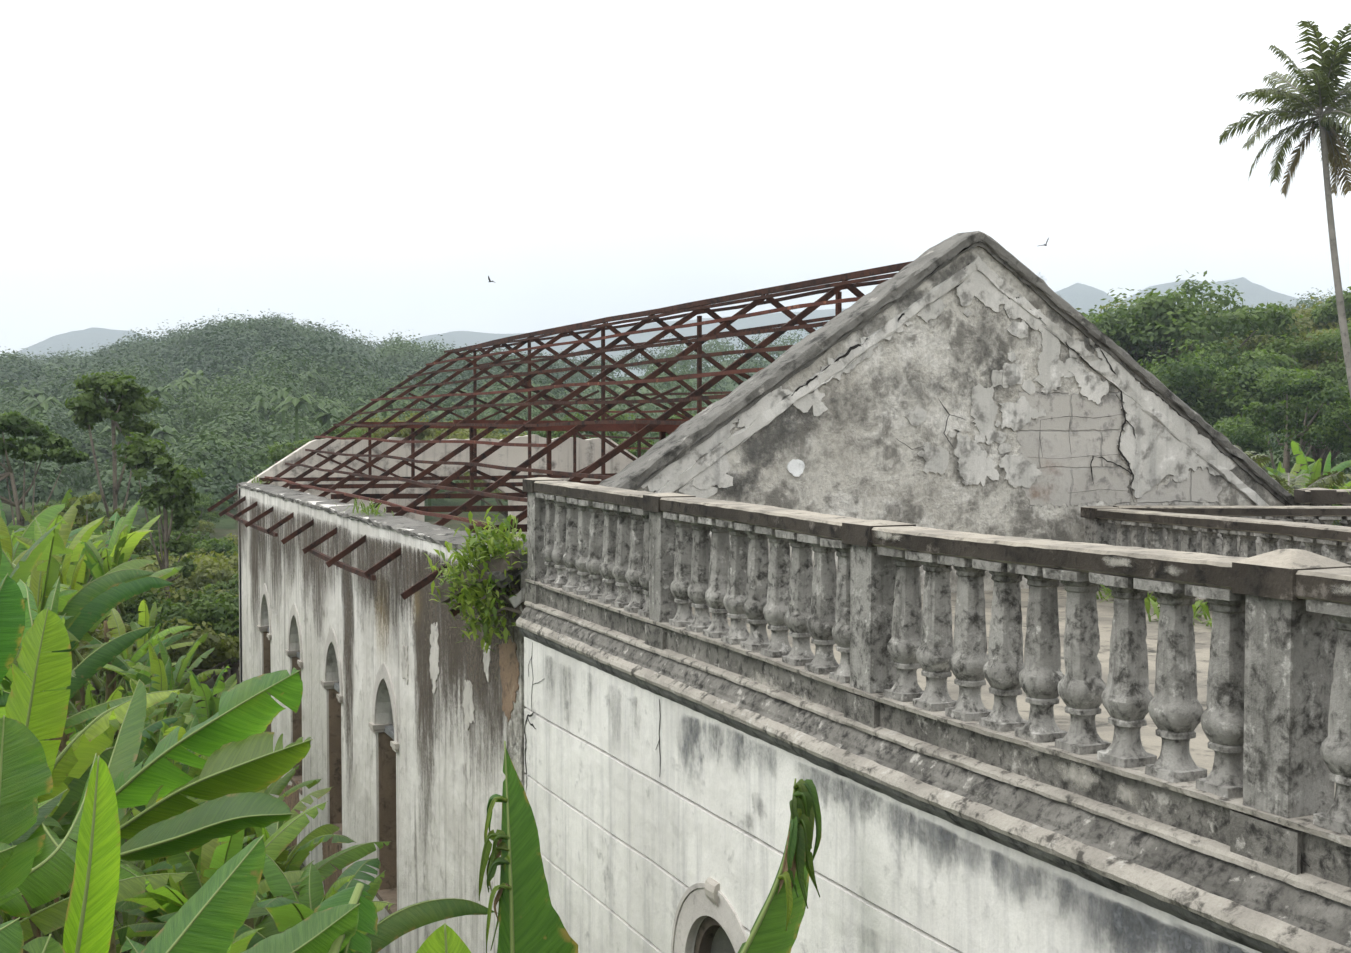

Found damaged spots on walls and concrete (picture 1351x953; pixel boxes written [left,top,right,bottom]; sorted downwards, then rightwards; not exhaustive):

spalling [641,271,1235,508]
crack [1016,297,1136,501]
damp [237,497,519,816]
damp [682,720,697,764]
damp [924,824,955,850]